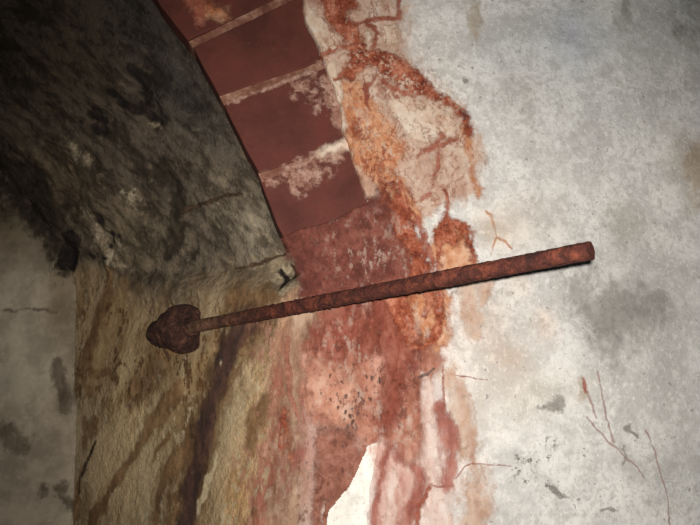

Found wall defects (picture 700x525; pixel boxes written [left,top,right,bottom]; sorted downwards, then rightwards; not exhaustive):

peeling [305,3,341,52]
peeling [325,61,348,132]
corrosion [309,0,484,277]
damp [0,139,79,277]
damp [152,158,188,261]
crack [180,192,243,214]
crack [486,211,512,249]
corrosion [385,288,451,352]
damp [108,319,277,525]
flaking render [311,392,418,525]
corrosion [403,464,432,525]
corrosion [434,368,493,525]